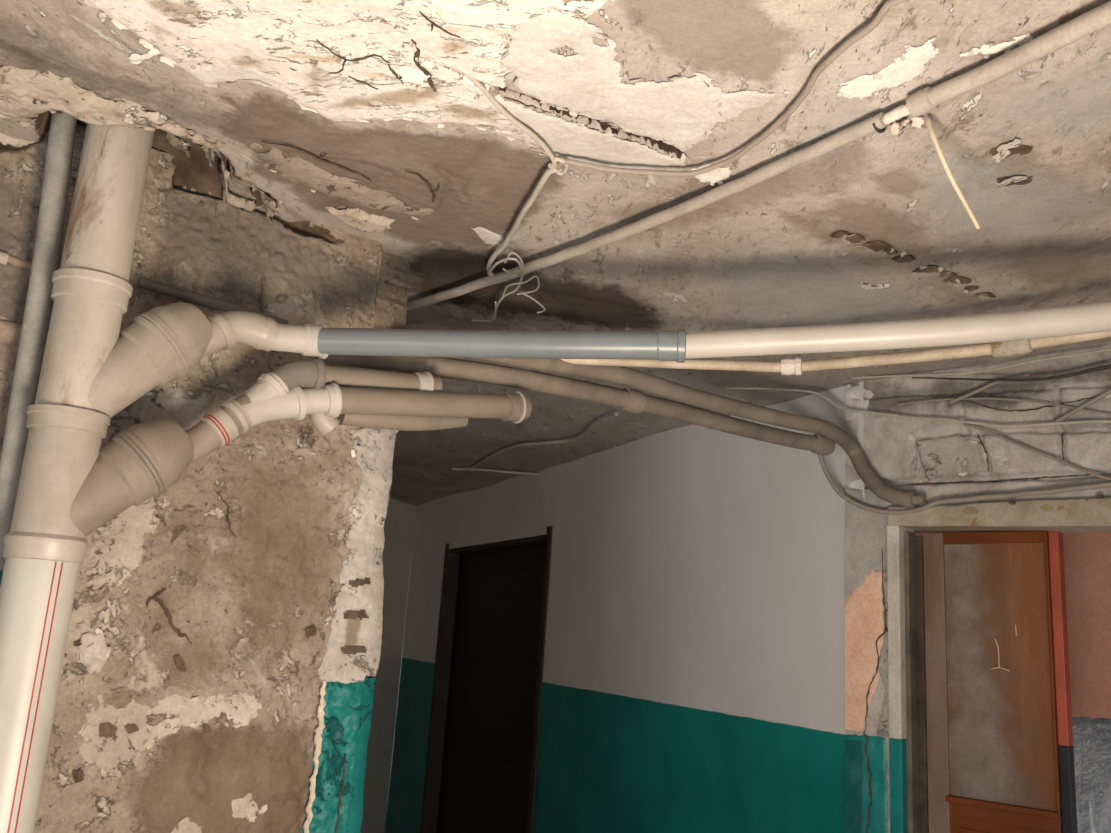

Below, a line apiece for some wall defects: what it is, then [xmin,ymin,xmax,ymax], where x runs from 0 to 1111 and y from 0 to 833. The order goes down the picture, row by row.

damp [0,43,150,97]
flaking render [0,65,434,233]
damp [344,92,431,106]
damp [166,96,659,329]
crack [316,11,686,159]
damp [629,0,792,128]
spalling [830,230,996,298]
flaking render [346,618,360,645]
peeling [845,464,892,733]
crack [863,549,888,833]